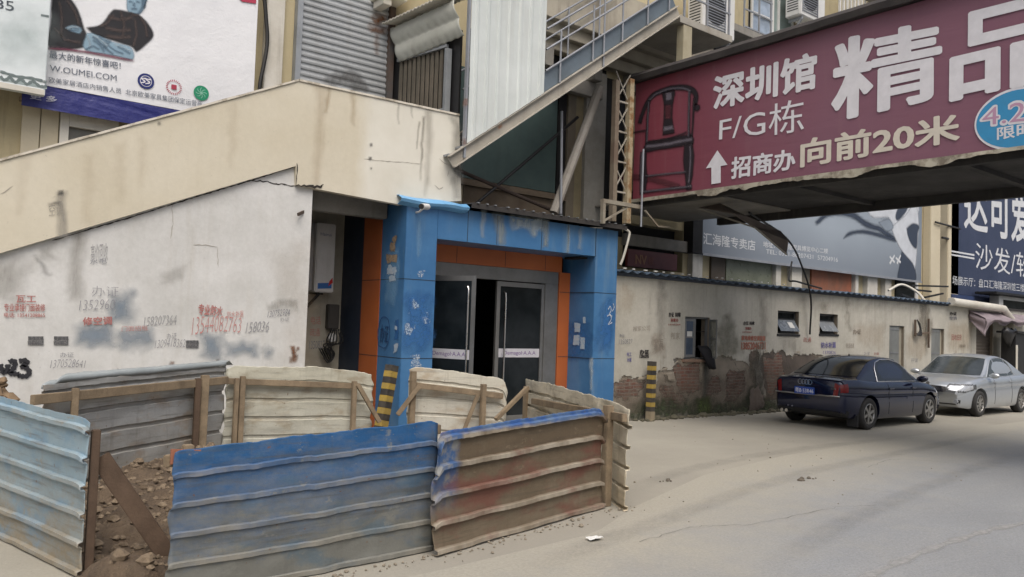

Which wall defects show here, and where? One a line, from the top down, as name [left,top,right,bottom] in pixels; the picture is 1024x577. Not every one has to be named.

crack [54,165,324,240]
spalling [613,349,823,416]